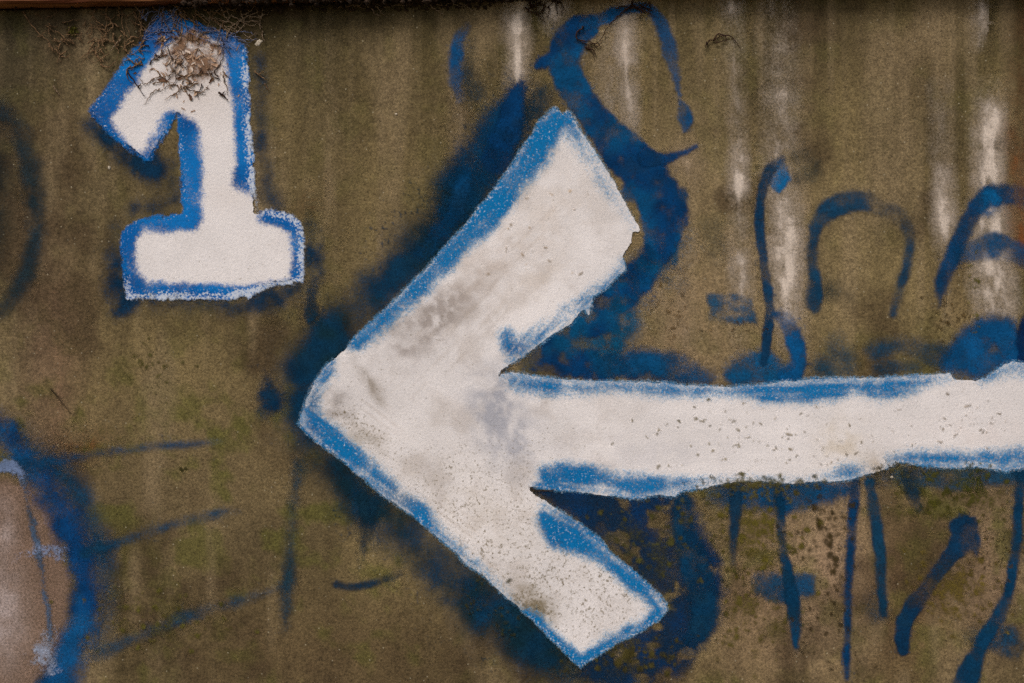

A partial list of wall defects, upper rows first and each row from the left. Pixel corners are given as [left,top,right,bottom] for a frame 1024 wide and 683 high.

leakage [507,0,528,83]
leakage [542,0,561,20]
leakage [616,3,635,119]
leakage [729,147,748,201]
leakage [934,170,955,239]
leakage [973,100,1005,190]
leakage [732,254,746,295]
leakage [768,177,805,324]
leakage [973,203,1015,315]